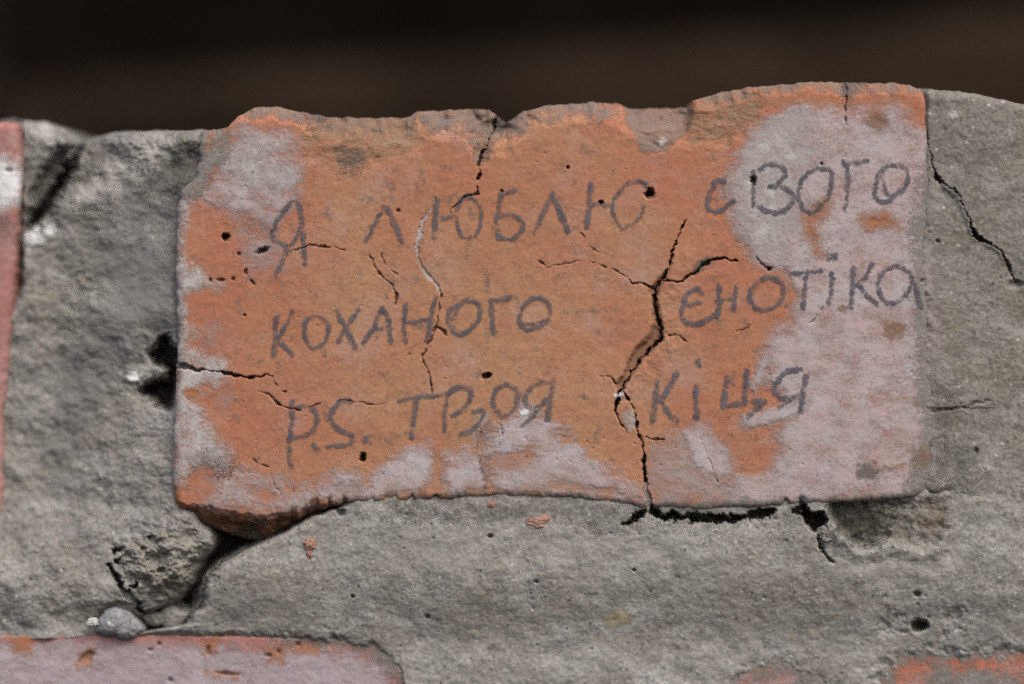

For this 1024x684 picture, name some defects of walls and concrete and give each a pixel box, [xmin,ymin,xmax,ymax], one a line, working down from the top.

crack [177,364,317,411]
crack [414,207,446,387]
leakage [24,101,971,585]
crack [612,225,736,482]
crack [970,222,1016,282]
crack [792,503,806,516]